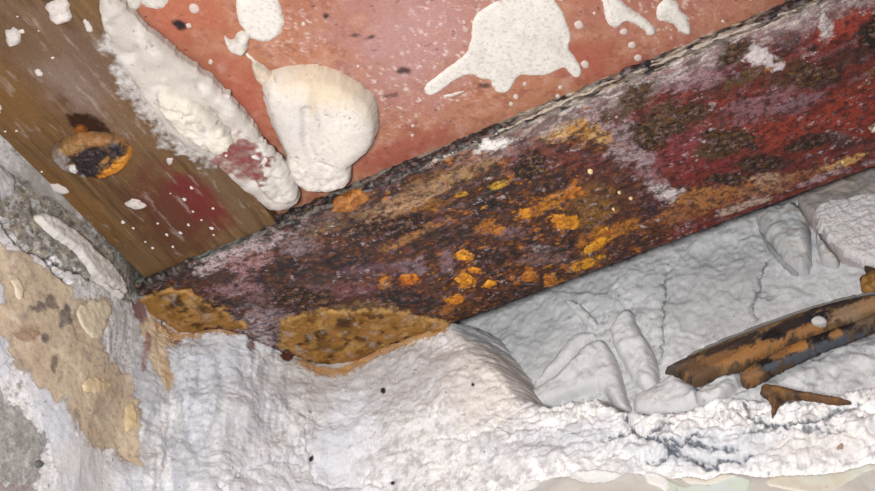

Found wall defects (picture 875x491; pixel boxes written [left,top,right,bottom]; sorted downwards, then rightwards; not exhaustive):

rust [754,0,811,24]
rust [67,113,109,133]
water stain [212,139,273,187]
rust [331,123,503,213]
rust [550,213,580,230]
rust [446,249,497,305]
spalling [0,174,143,466]
rust [137,255,247,390]
rust [277,306,450,377]
crack [659,273,668,358]
spalling [0,391,48,488]
peeling [516,464,875,491]